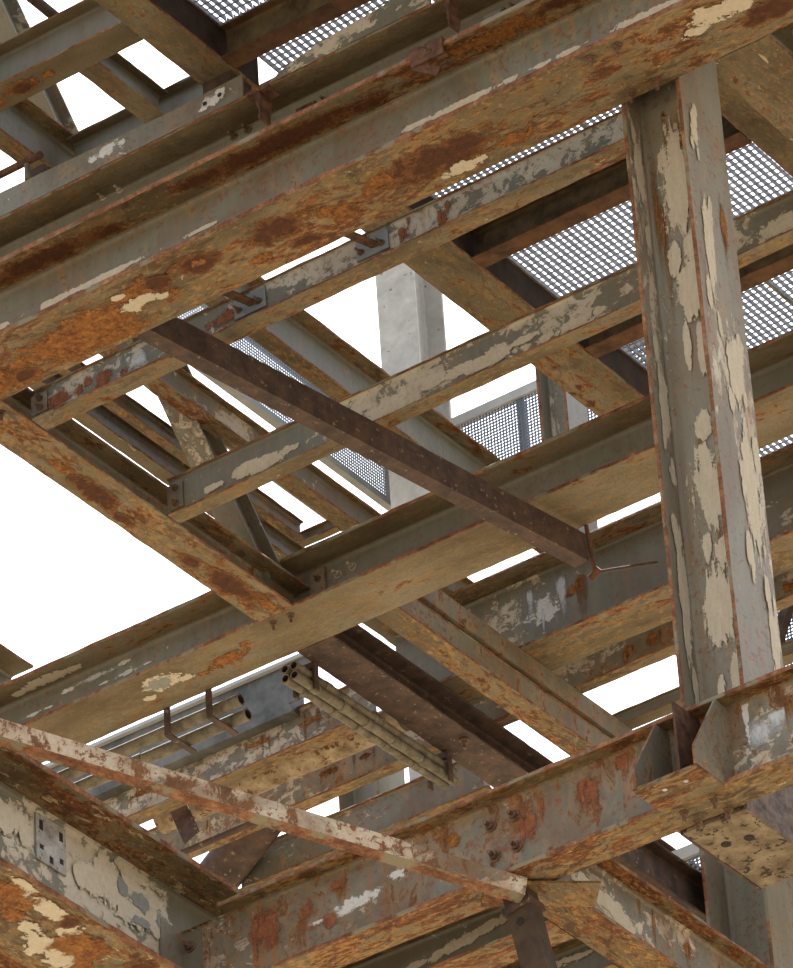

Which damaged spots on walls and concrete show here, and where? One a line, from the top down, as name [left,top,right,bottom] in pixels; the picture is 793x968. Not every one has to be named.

peeling [681,0,754,41]
corrosion [168,87,394,193]
corrosion [361,122,535,193]
corrosion [0,218,132,289]
corrosion [0,250,222,397]
peeling [111,292,169,313]
peeling [631,103,782,703]
corrosion [48,460,137,528]
peeling [204,443,299,494]
peeling [11,876,86,968]
corrosion [44,915,112,968]
peeling [73,849,173,939]